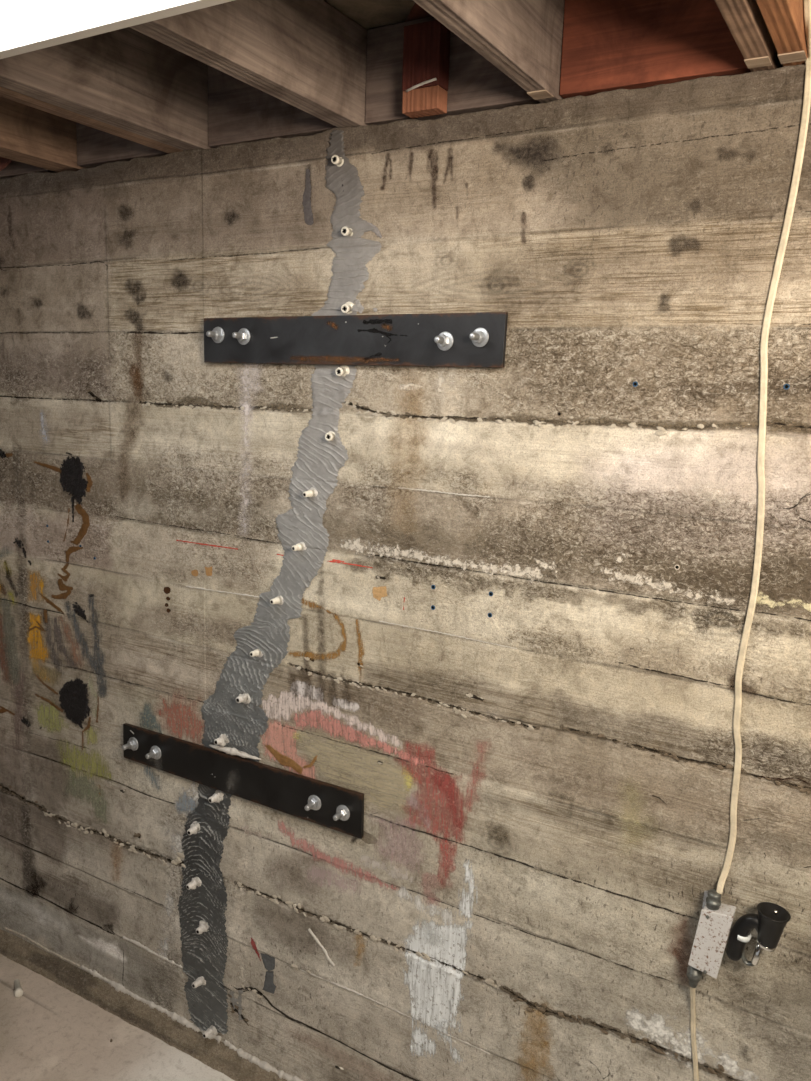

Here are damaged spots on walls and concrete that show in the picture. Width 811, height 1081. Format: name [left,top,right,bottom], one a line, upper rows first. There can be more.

crack [219,887,737,1081]